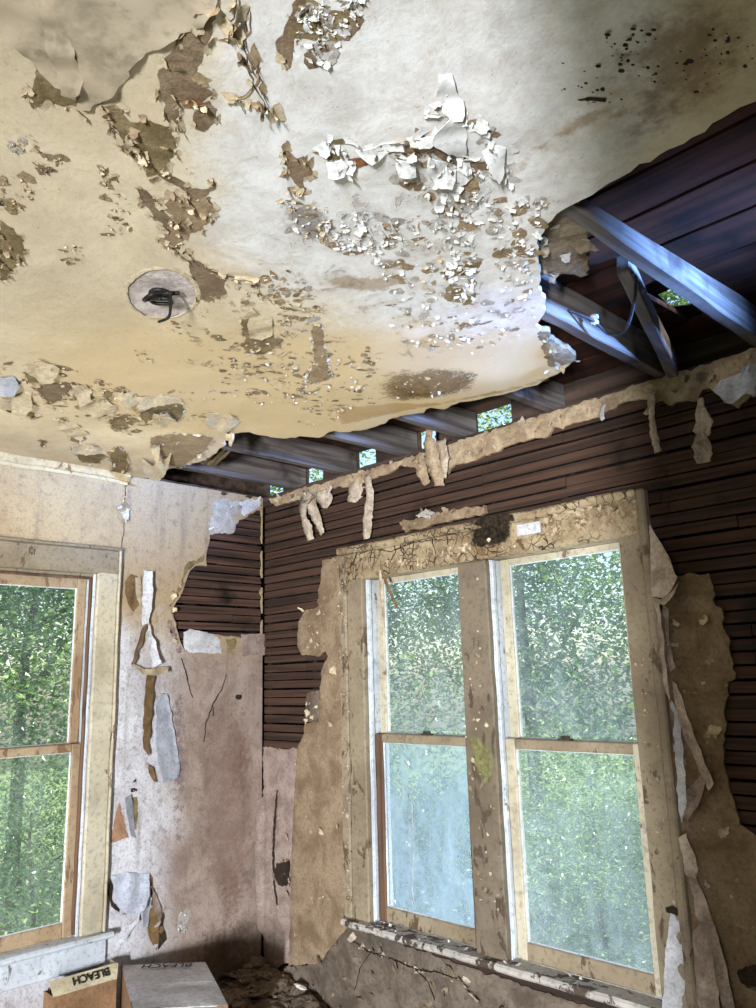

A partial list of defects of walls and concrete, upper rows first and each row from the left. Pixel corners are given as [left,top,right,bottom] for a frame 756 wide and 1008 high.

mould [561,65,623,103]
mould [604,28,665,84]
mould [675,28,754,80]
peeling [0,0,477,481]
peeling [275,74,600,374]
water stain [383,370,472,400]
crack [354,528,453,562]
peeling [385,538,491,570]
peeling [502,501,636,549]
spalling [167,554,207,653]
crack [181,658,226,742]
crack [347,932,481,1004]